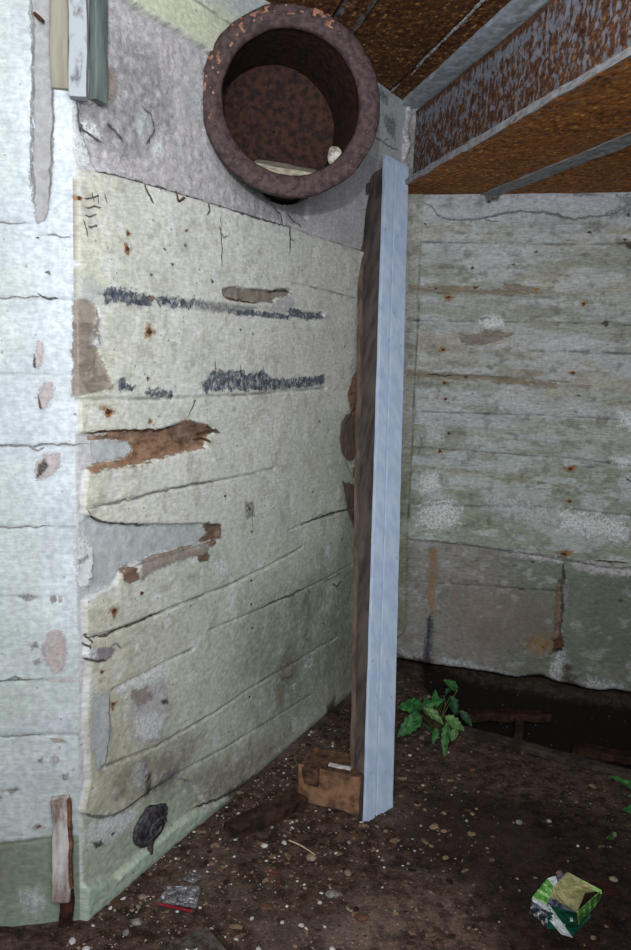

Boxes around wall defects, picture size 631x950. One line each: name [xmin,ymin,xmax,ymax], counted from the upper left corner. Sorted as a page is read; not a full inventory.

rust [229,4,334,47]
crack [424,203,624,222]
spalling [222,285,295,315]
spalling [70,279,113,396]
spalling [86,419,220,474]
peeling [609,455,631,500]
peeling [409,469,631,577]
spalling [74,516,230,593]